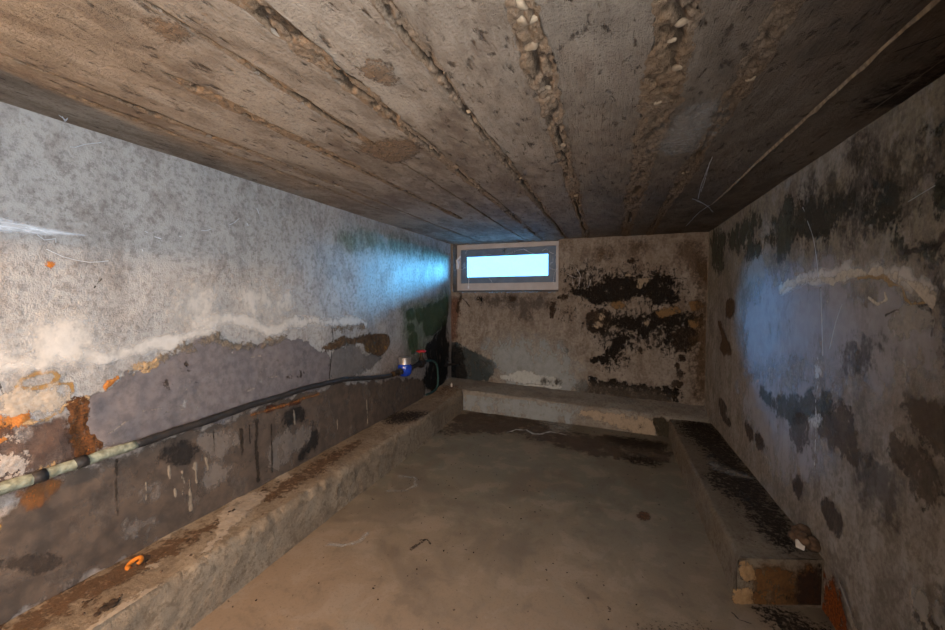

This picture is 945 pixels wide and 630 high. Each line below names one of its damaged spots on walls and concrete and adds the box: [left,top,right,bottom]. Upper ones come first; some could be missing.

water stain [858,55,945,113]
flaking render [103,330,287,391]
flaking render [322,323,390,357]
water stain [0,137,945,630]
flaking render [0,382,103,458]